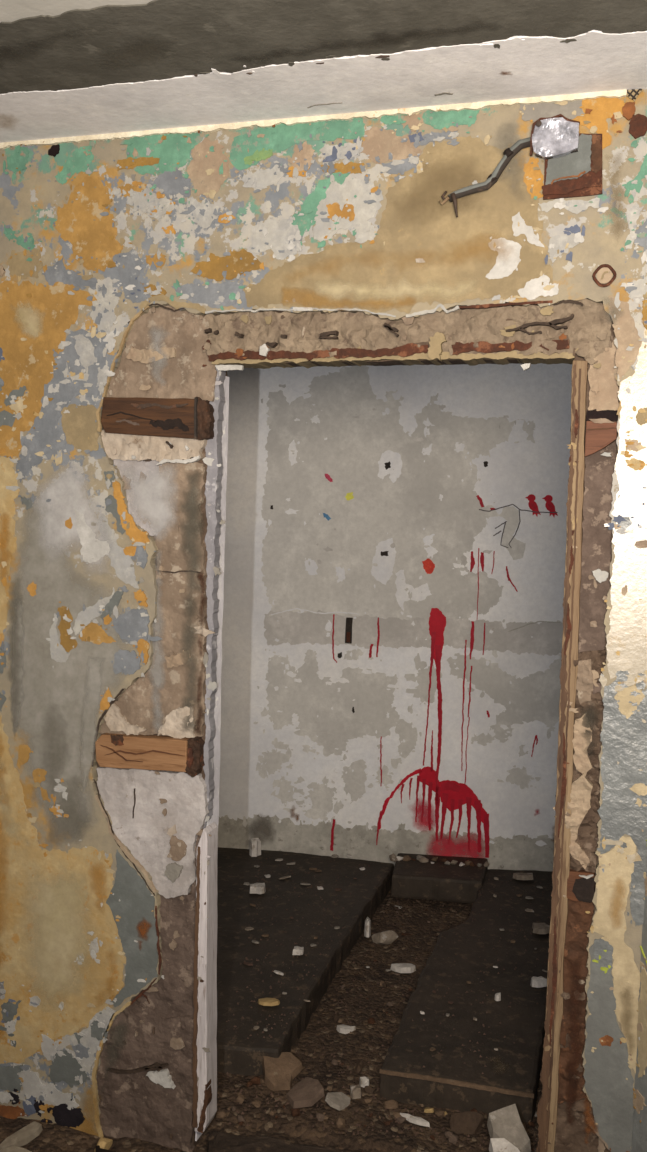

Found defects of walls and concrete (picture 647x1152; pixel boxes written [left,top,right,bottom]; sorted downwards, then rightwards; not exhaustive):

peeling [0,0,647,94]
peeling [2,144,32,185]
spalling [48,144,60,157]
peeling [55,141,98,185]
peeling [114,130,236,231]
peeling [519,96,647,264]
peeling [53,175,167,303]
corrosion [202,339,429,367]
peeling [46,585,150,675]
peeling [218,365,569,871]
peeling [32,768,69,818]
crack [107,1062,169,1074]